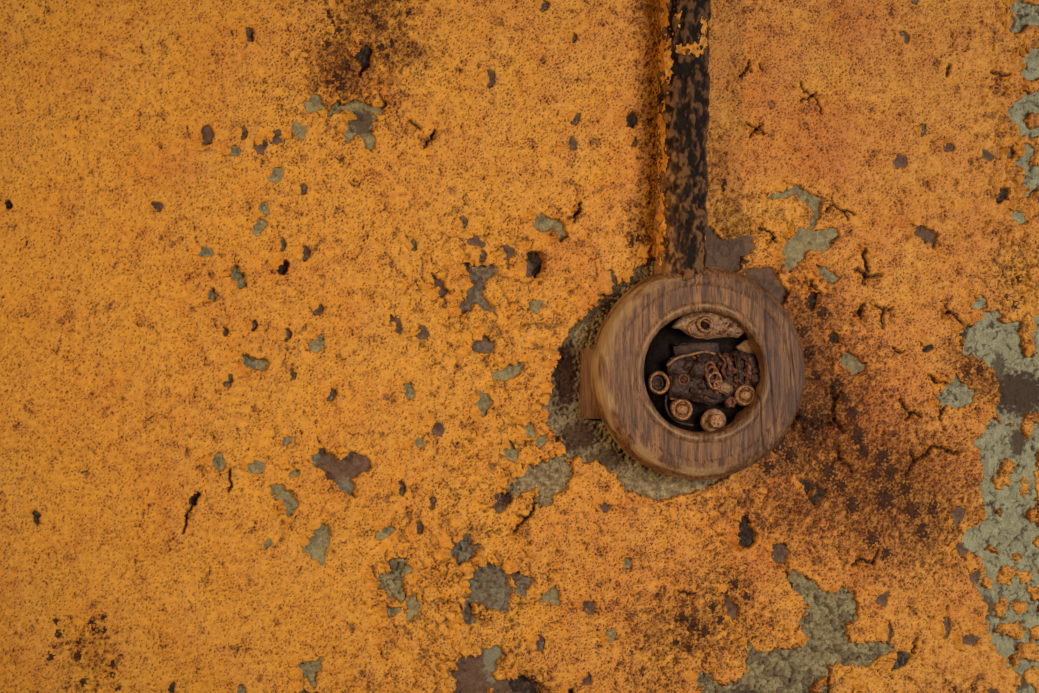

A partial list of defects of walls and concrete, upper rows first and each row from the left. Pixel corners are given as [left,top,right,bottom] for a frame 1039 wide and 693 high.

peeling [303,88,390,151]
peeling [984,0,1039,224]
peeling [420,210,566,365]
peeling [705,179,839,309]
flaking render [481,242,727,513]
peeling [925,369,974,412]
peeling [240,434,371,565]
peeling [938,290,1039,693]
peeling [360,558,419,620]
peeling [437,639,539,693]
peeling [435,531,561,627]
peeling [683,513,910,693]